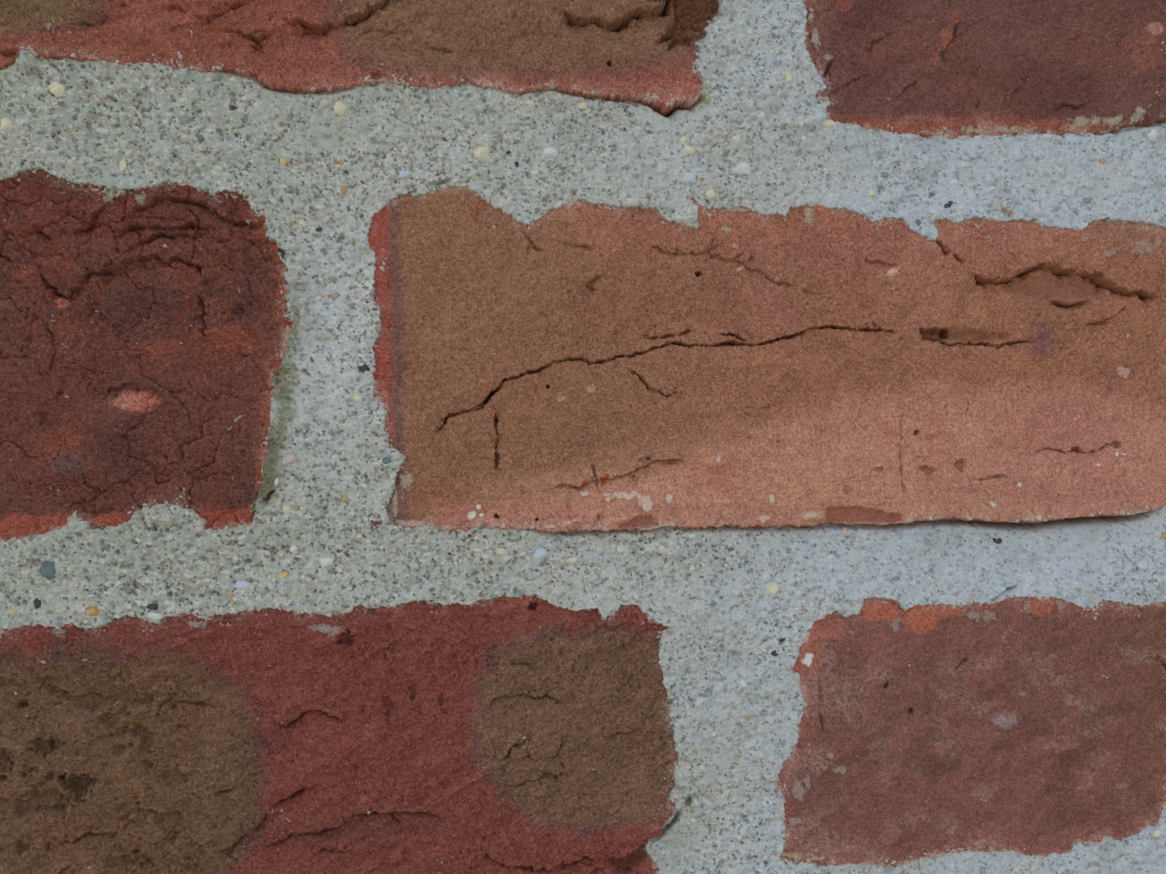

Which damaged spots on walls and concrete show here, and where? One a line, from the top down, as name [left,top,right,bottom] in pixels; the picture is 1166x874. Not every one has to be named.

crack [560,0,674,46]
crack [934,239,1162,328]
crack [434,322,1030,474]
crack [553,453,689,525]